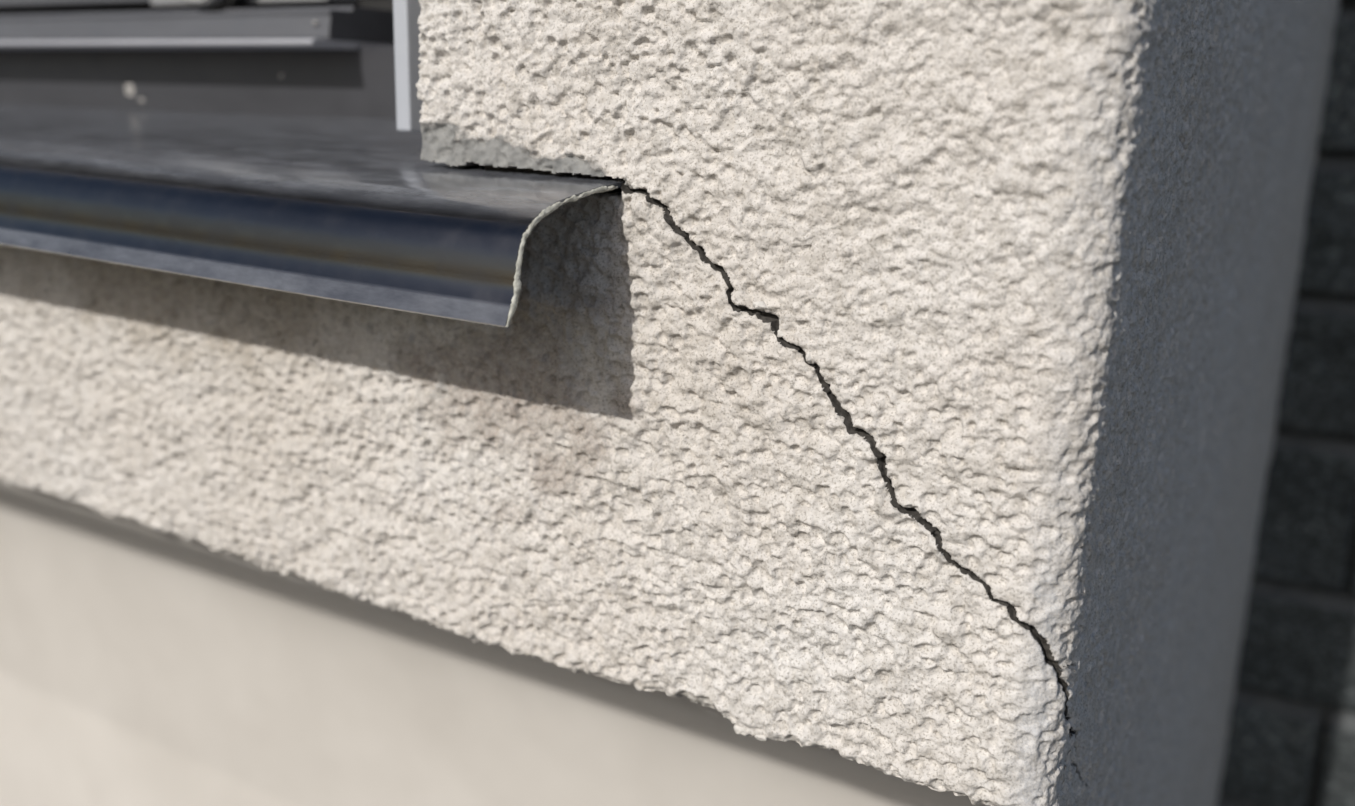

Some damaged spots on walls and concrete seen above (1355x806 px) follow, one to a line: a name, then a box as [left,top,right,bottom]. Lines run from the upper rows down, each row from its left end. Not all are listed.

crack [616,178,1088,789]